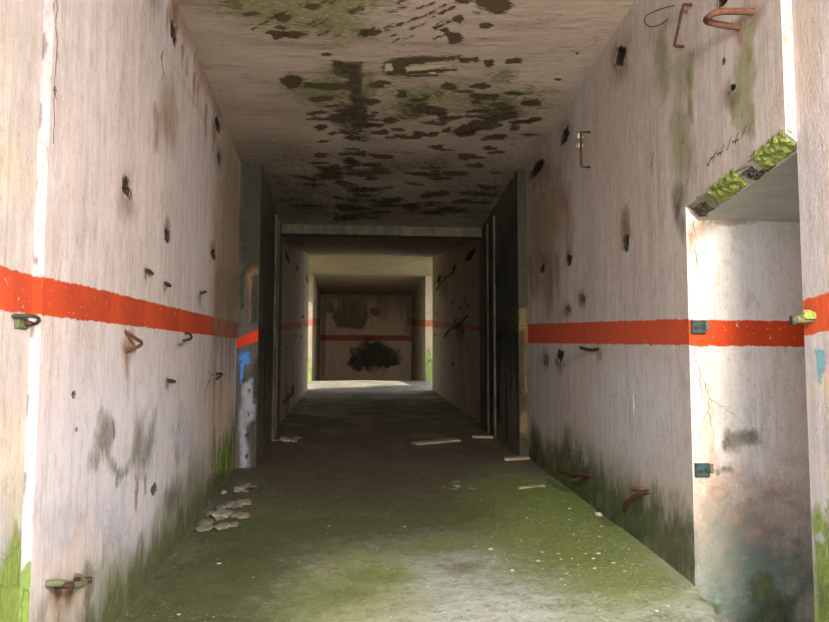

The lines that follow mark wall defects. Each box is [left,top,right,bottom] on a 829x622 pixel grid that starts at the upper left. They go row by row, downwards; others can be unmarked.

rust [703,8,755,31]
crack [694,344,747,455]
damp [97,421,115,463]
damp [134,429,153,467]
damp [0,529,21,587]